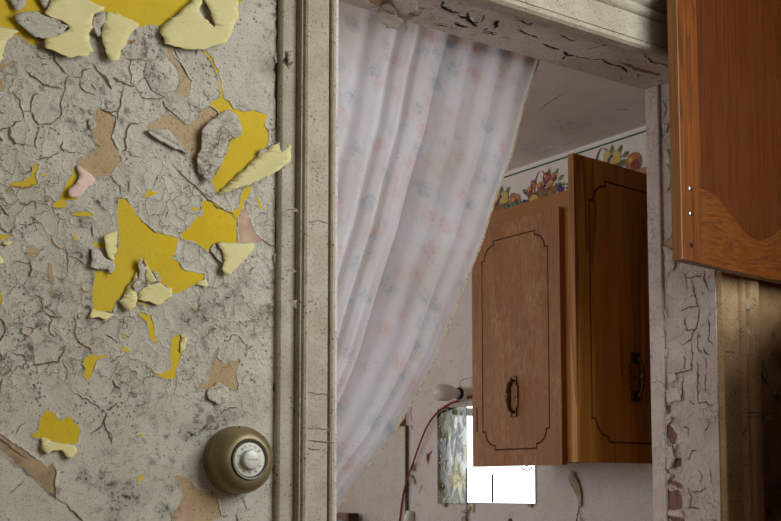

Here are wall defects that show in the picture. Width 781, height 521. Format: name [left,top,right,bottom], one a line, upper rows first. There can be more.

peeling [352,0,428,32]
crack [438,0,668,139]
crack [0,26,185,444]
peeling [0,0,294,384]
crack [153,163,235,217]
crack [0,420,85,521]
peeling [28,407,84,458]
peeling [169,472,222,521]
peeling [194,349,241,405]
crack [567,469,583,521]
peeling [665,373,691,521]
crack [668,271,736,521]